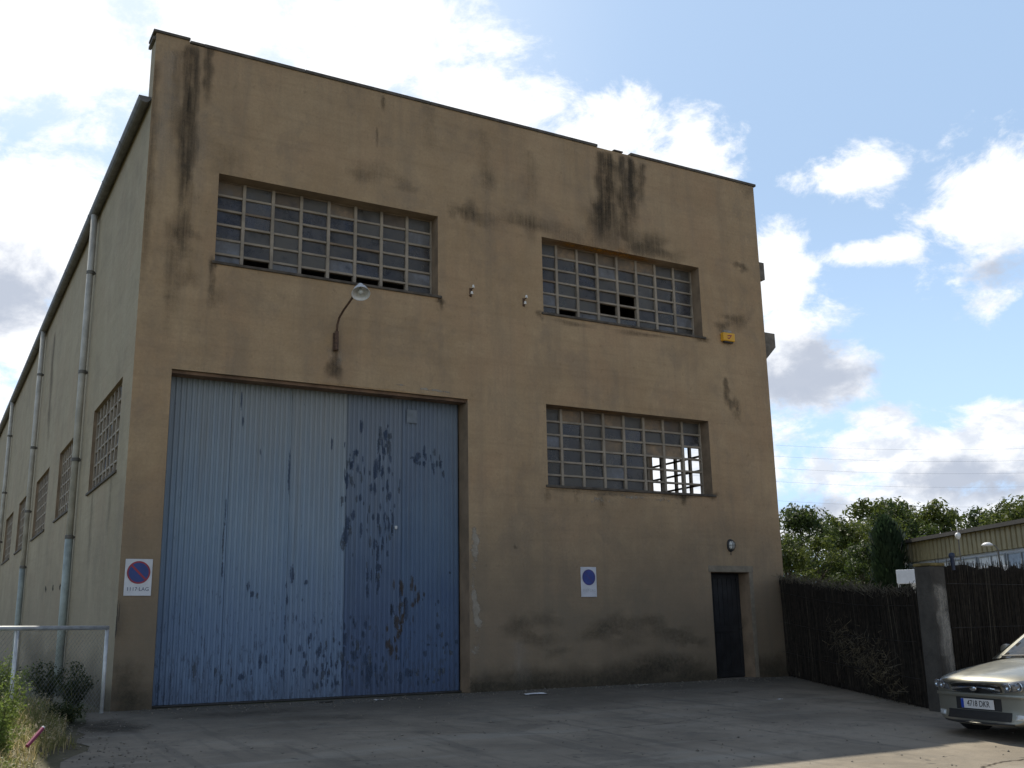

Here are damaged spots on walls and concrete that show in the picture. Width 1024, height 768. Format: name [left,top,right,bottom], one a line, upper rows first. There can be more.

peeling [331,425,400,597]
peeling [281,568,458,691]